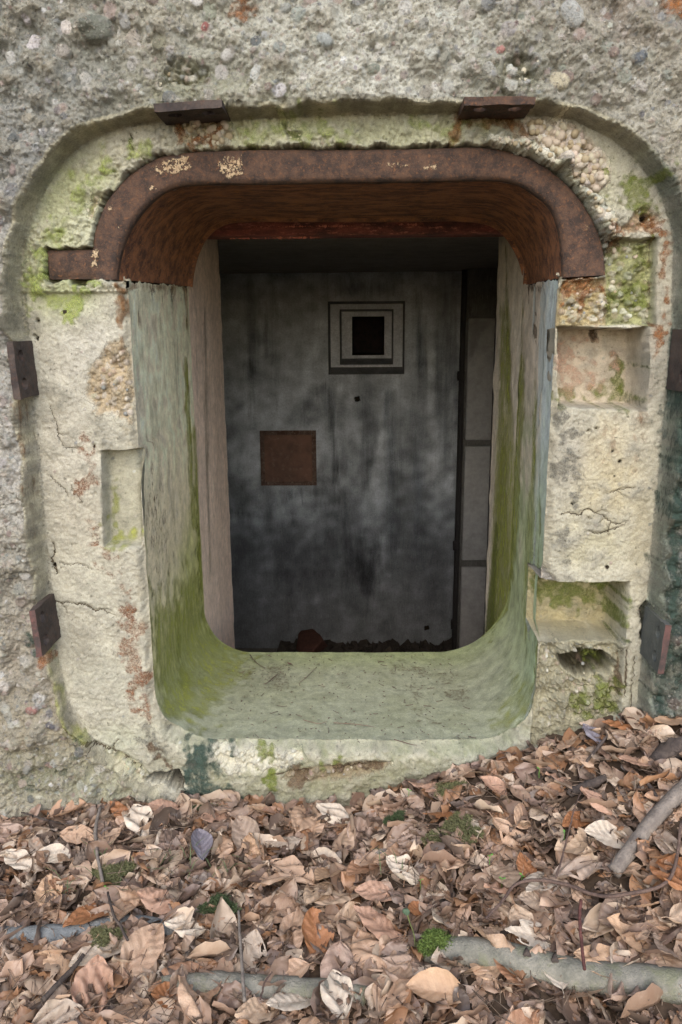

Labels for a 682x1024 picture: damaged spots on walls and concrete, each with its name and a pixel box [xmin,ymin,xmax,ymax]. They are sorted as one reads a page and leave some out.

spalling [485,105,664,328]
corrosion [641,216,669,354]
spalling [82,340,136,426]
crack [51,543,92,574]
crack [55,600,112,614]
corrosion [117,587,153,721]
water stain [485,444,515,632]
spalling [533,621,625,731]
crack [561,487,634,534]
water stain [184,745,209,798]